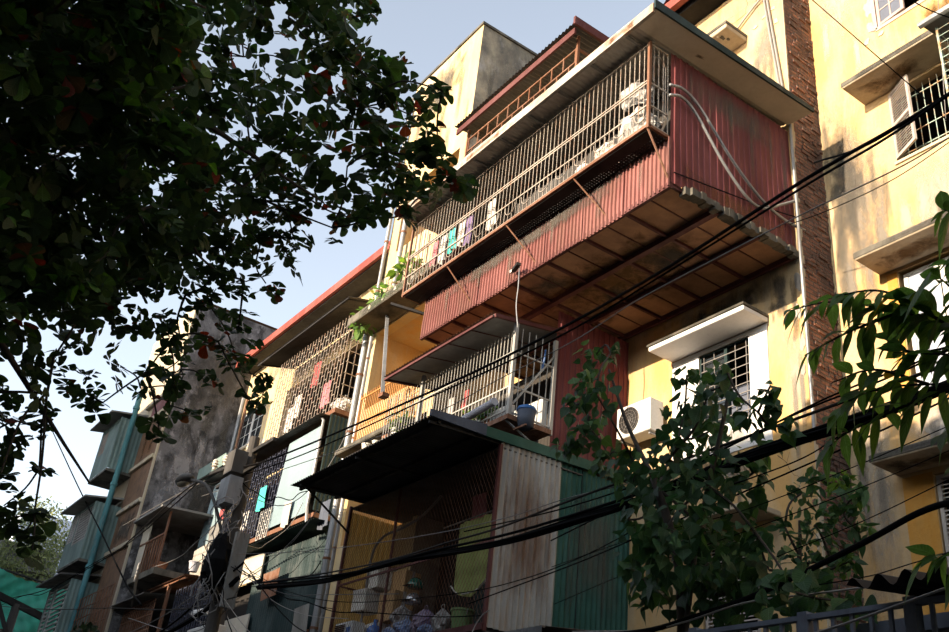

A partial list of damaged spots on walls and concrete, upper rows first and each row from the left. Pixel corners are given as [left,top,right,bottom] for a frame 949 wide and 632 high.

leakage [830,126,949,309]
leakage [182,348,238,413]
leakage [691,280,806,430]
leakage [153,440,214,513]